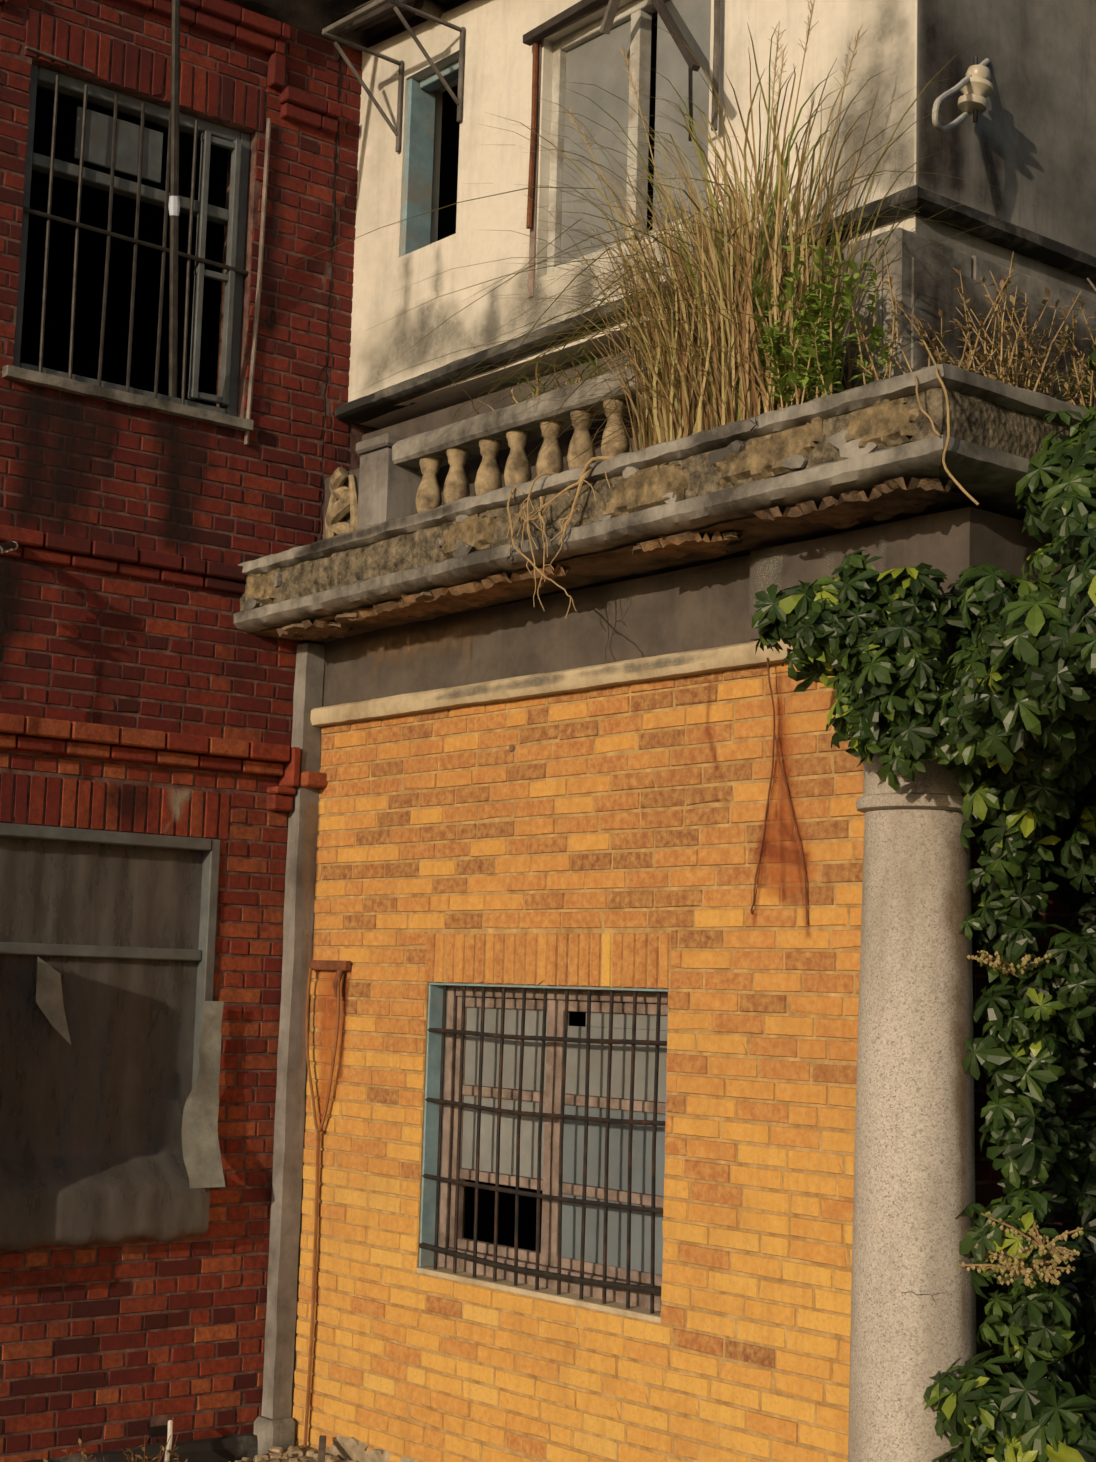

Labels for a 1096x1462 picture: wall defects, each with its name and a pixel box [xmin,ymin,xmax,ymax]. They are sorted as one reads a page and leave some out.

damp [984,142,1001,208]
spalling [599,462,690,521]
spalling [435,514,499,560]
spalling [244,568,282,610]
spalling [276,564,571,640]